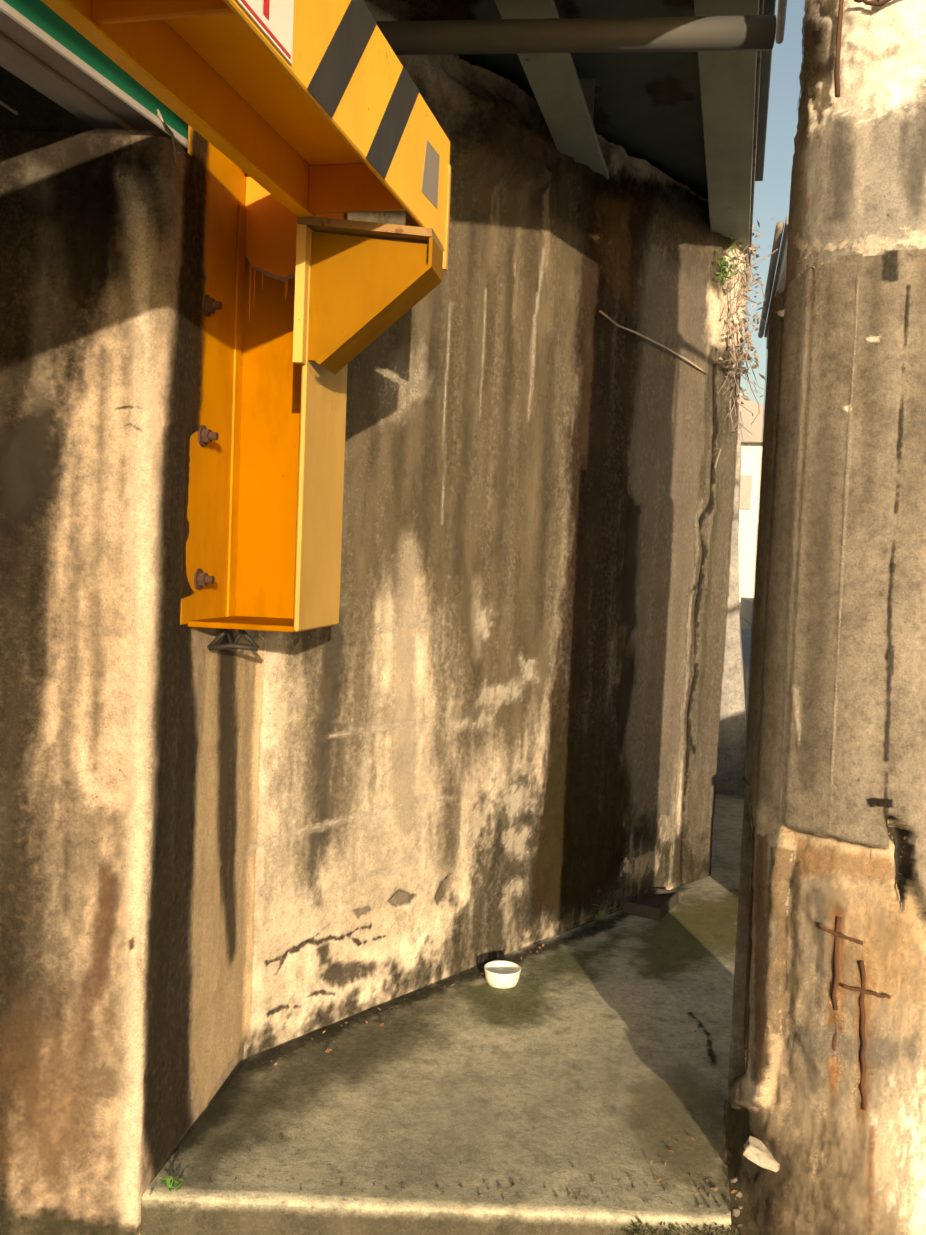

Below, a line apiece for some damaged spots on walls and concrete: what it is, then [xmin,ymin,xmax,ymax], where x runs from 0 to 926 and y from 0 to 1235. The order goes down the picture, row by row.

rust [402,0,477,21]
spalling [799,0,926,142]
spalling [789,228,926,262]
crack [903,285,911,370]
damp [0,81,743,1235]
crack [672,365,723,886]
crack [884,402,904,815]
crack [267,990,335,1017]
crack [265,924,385,971]
spalling [723,804,926,1235]